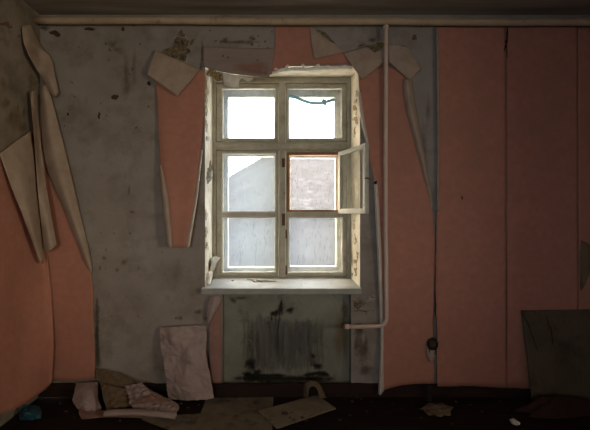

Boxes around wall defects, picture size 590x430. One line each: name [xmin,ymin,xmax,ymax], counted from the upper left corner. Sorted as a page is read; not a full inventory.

flaking render [160,28,195,63]
flaking render [272,64,352,76]
flaking render [205,68,223,141]
peeling [206,256,220,284]
water stain [236,316,334,383]